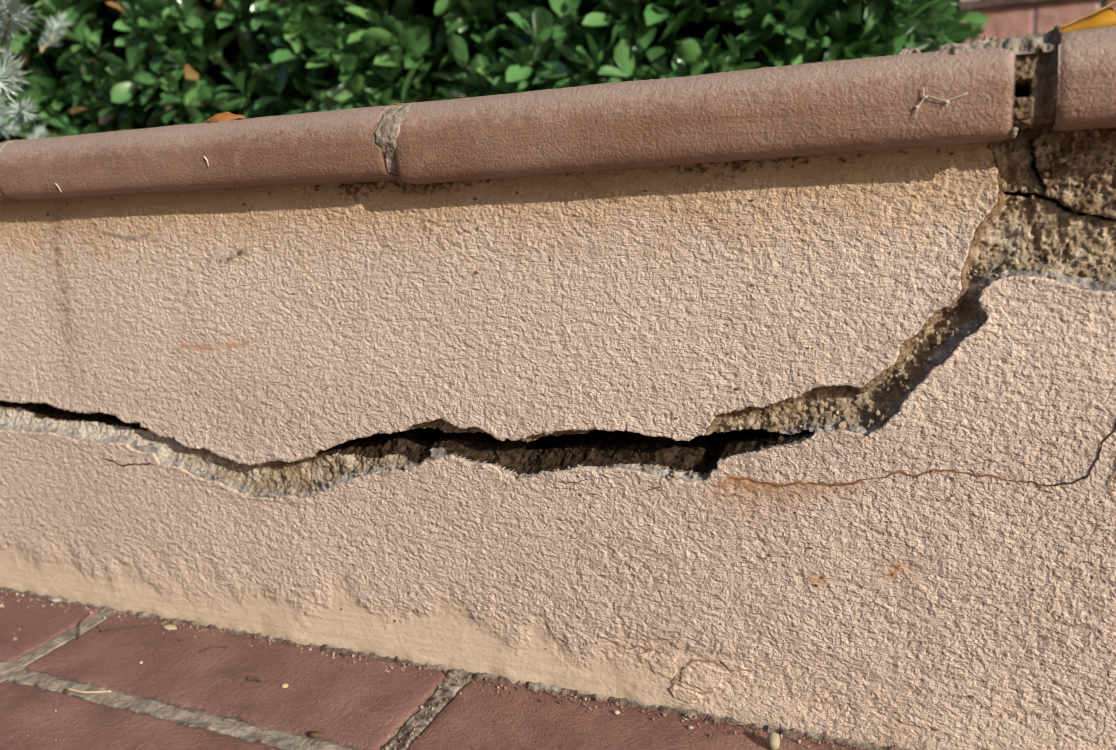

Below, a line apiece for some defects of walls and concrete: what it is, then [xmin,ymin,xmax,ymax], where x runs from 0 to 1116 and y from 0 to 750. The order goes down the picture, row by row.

spalling [699,123,1116,436]
crack [0,401,157,467]
crack [315,424,1116,502]